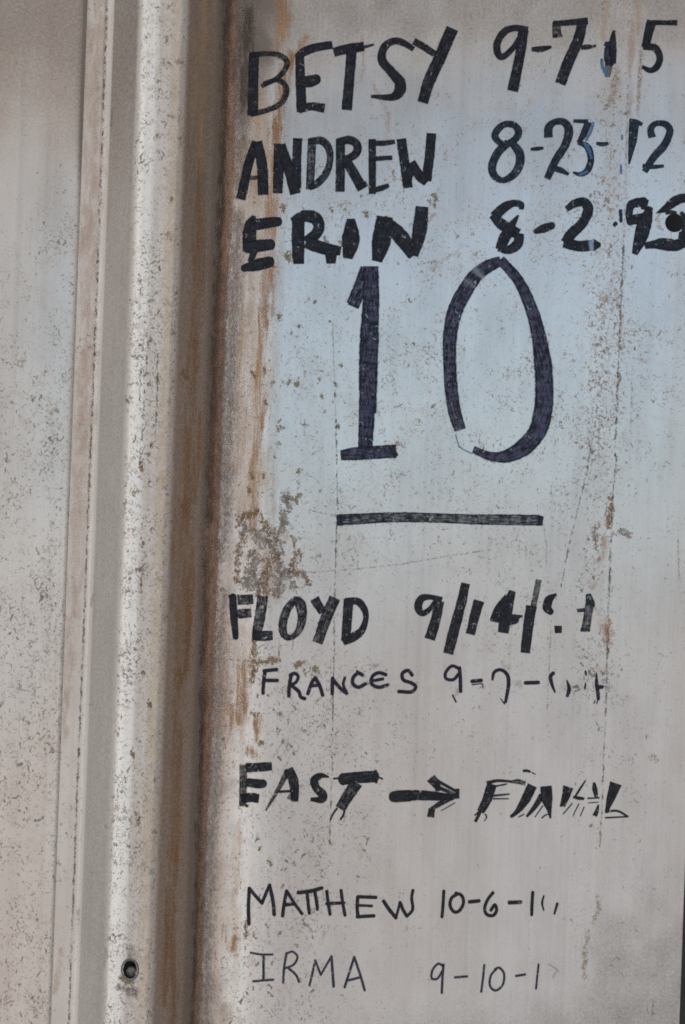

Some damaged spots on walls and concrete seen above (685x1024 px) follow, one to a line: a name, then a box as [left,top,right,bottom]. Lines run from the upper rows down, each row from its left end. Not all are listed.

corrosion [184,0,320,1024]